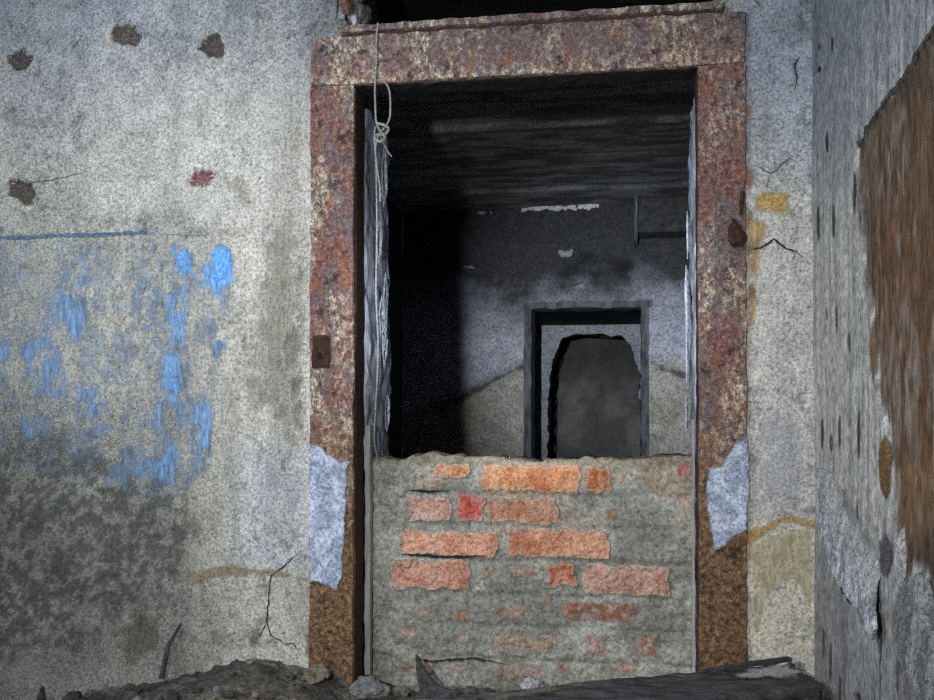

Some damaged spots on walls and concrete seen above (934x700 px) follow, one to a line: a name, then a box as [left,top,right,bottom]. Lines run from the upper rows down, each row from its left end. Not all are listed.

spalling [104,22,142,50]
spalling [1,176,43,212]
peeling [0,230,232,295]
peeling [52,263,89,338]
peeling [22,339,59,395]
peeling [113,279,212,483]
peeling [207,322,225,357]
peeling [853,24,934,700]
corrosion [878,437,892,500]
peeling [815,467,881,651]
crack [259,555,299,651]
spalling [822,628,840,700]